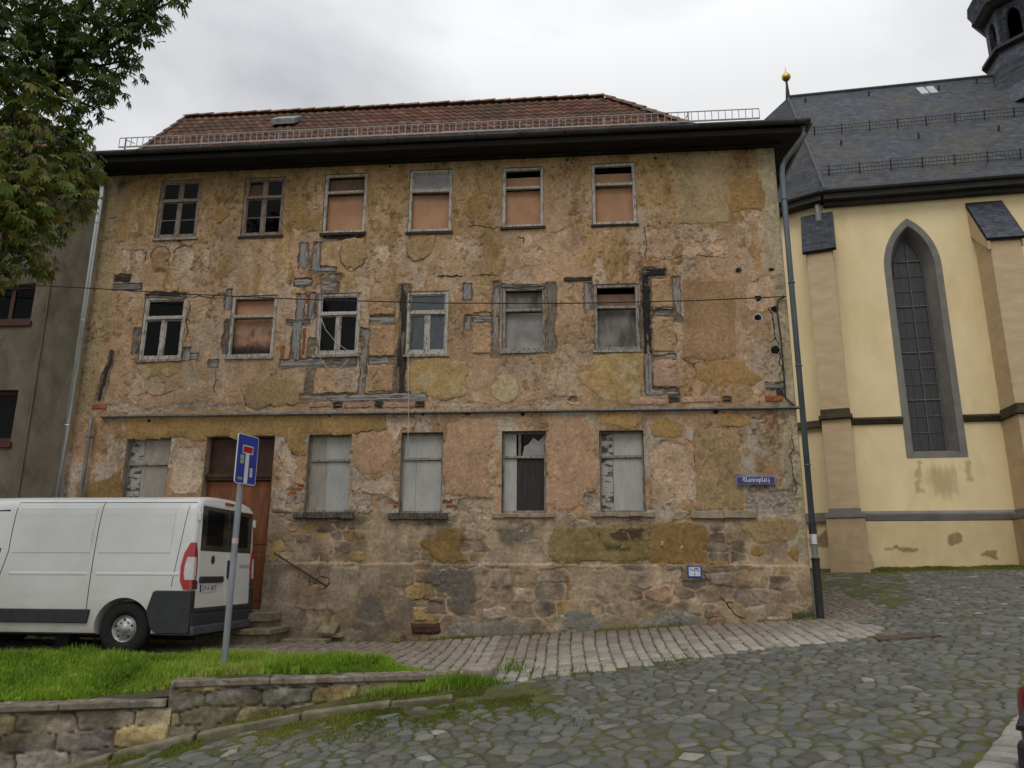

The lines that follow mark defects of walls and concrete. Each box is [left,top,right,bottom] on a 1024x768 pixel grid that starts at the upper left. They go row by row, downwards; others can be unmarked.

flaking render [91,234,594,512]
flaking render [629,227,732,406]
flaking render [744,274,776,311]
flaking render [765,381,785,402]
crack [768,309,783,381]
crack [790,431,798,506]
leakage [599,528,643,540]
flaking render [948,533,962,545]